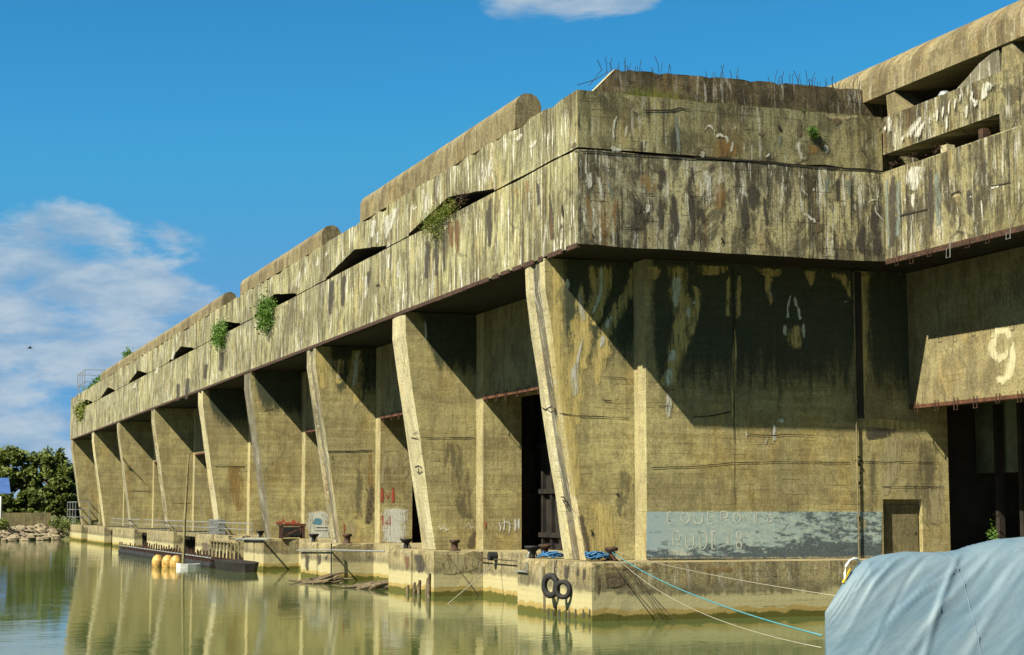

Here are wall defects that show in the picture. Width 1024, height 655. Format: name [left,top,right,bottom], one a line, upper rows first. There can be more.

water stain [901,82,1001,141]
water stain [633,167,711,243]
water stain [741,185,768,228]
water stain [825,177,851,201]
water stain [548,259,634,496]
water stain [648,260,940,525]